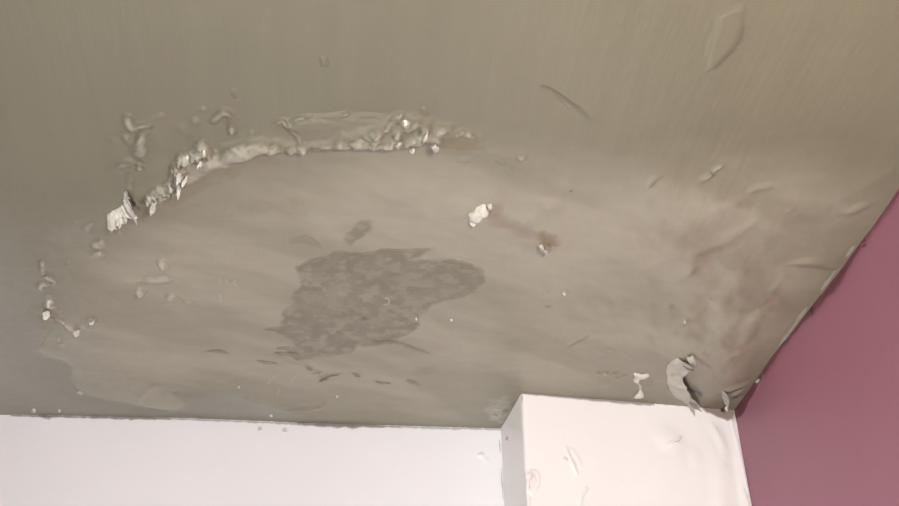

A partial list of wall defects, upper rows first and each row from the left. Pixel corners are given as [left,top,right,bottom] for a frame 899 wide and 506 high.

peeling [107,139,309,233]
flaking render [468,203,493,227]
peeling [36,260,100,348]
water stain [262,219,487,361]
peeling [633,373,654,399]
peeling [666,355,752,417]
peeling [729,421,751,506]